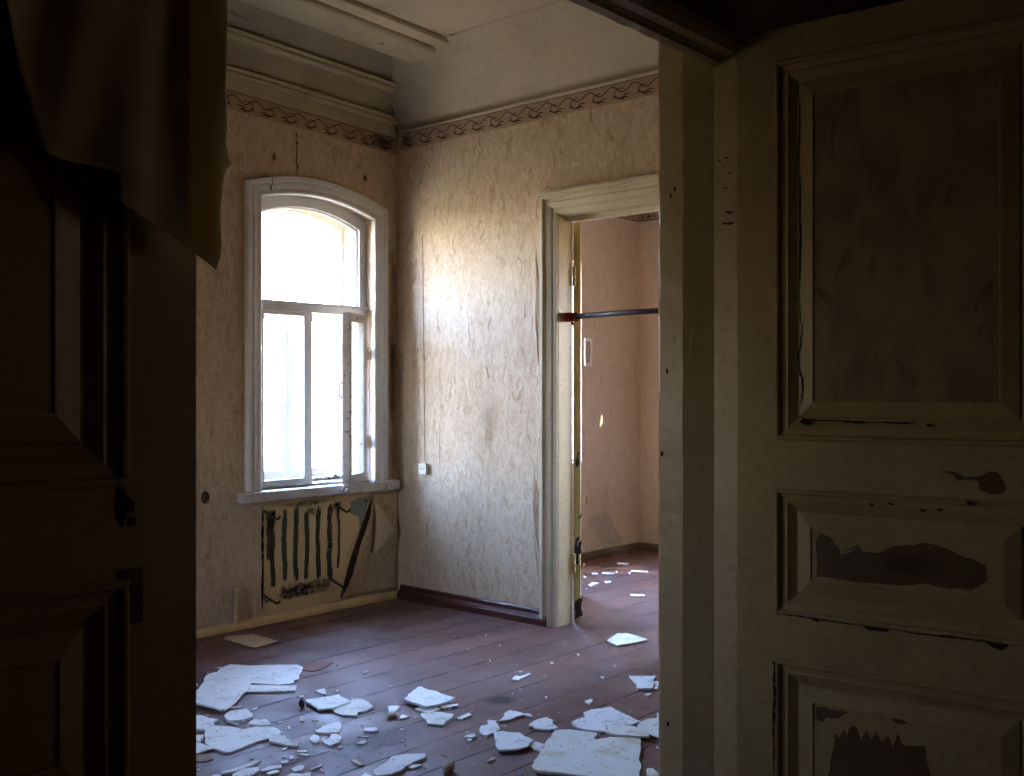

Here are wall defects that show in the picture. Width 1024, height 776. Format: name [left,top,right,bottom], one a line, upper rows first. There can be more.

crack [269,131,299,190]
peeling [939,471,1006,495]
peeling [262,493,369,614]
peeling [816,533,987,590]
peeling [815,707,931,776]